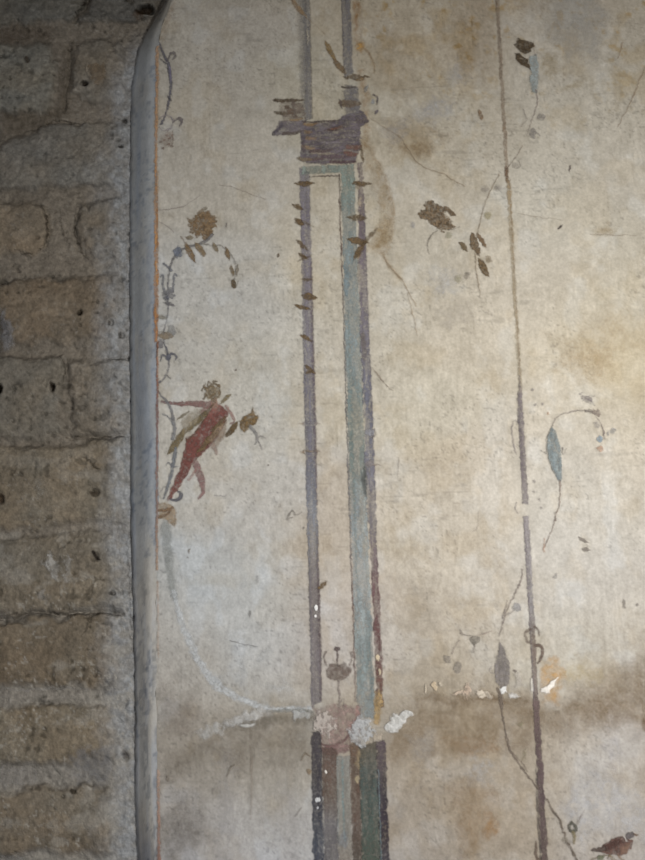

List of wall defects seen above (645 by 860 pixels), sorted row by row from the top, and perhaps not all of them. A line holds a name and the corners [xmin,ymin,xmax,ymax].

flaking render [203,708,264,739]
flaking render [314,711,337,738]
flaking render [348,710,413,748]